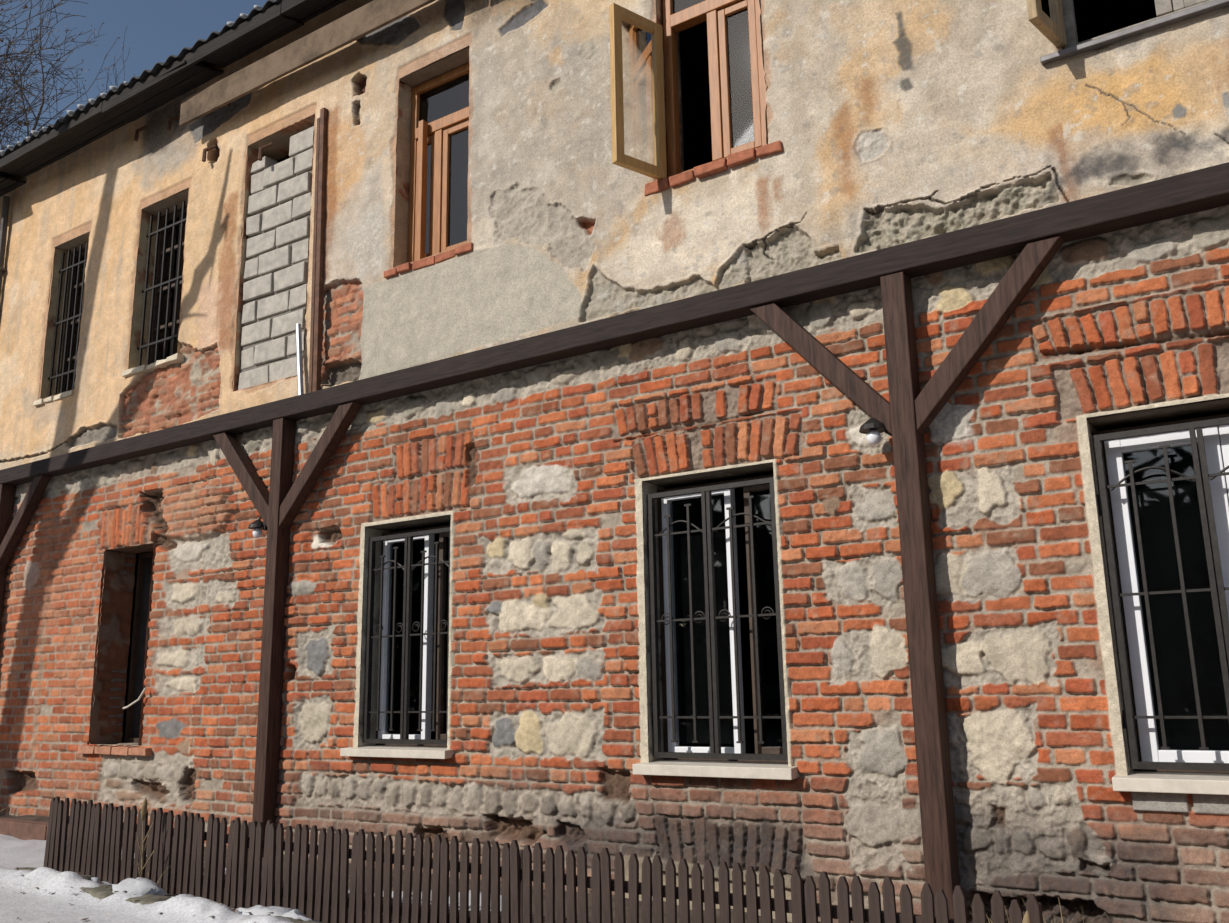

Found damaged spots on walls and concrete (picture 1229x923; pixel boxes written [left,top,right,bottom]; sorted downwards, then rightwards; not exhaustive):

crack [1086,83,1229,143]
spalling [850,123,894,166]
spalling [1103,168,1160,189]
spalling [484,166,1069,325]
spalling [308,274,364,392]
spalling [64,337,224,451]
crack [0,429,88,463]